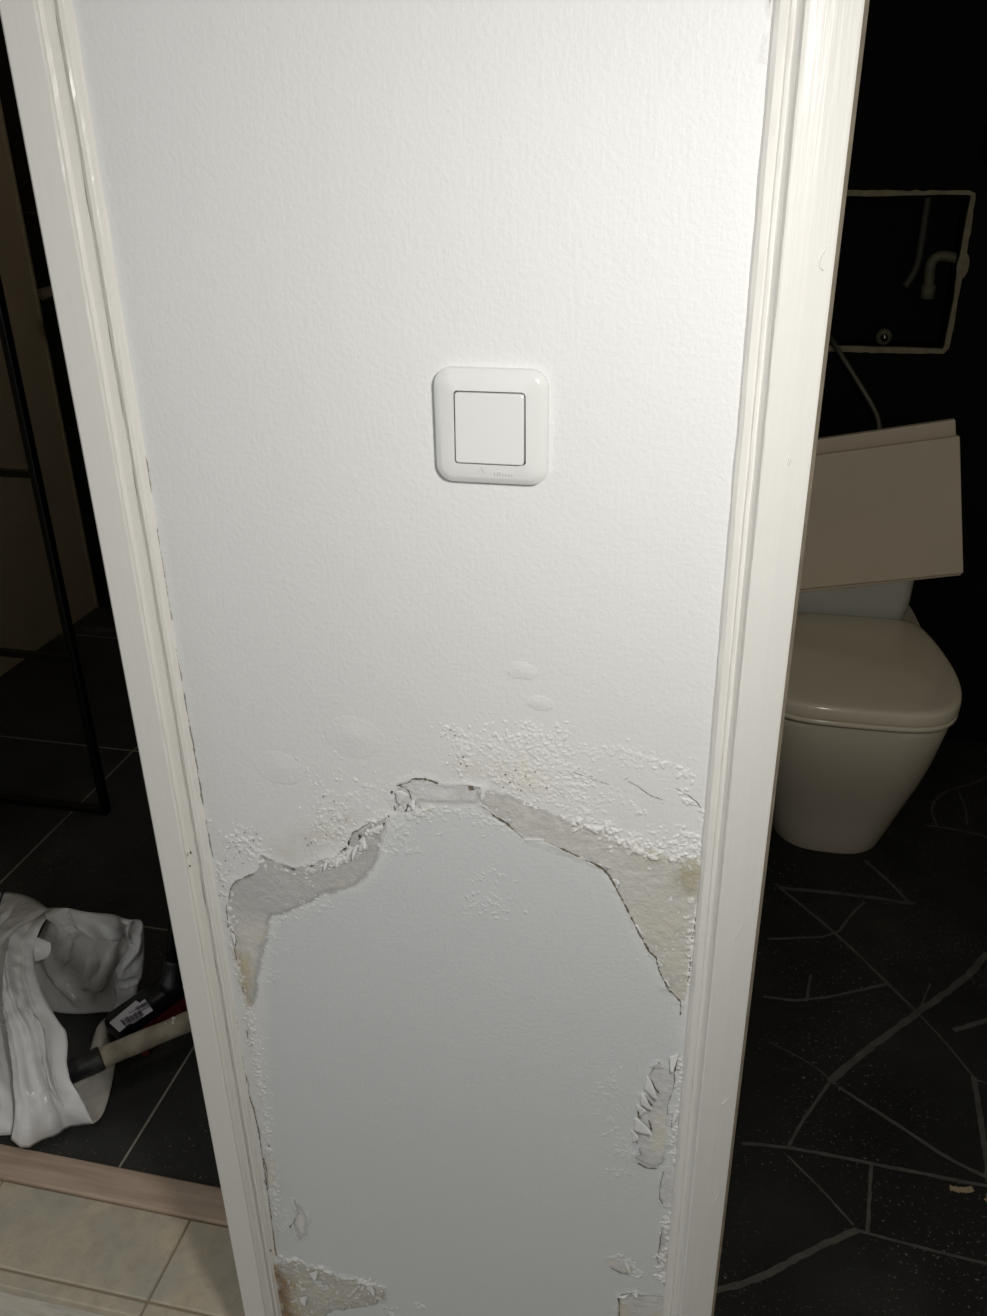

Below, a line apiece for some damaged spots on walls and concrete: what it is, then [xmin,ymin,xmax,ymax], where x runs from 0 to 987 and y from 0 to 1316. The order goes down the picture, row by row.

peeling [219,770,701,1015]
peeling [625,1052,683,1169]
spalling [275,1197,391,1316]
spalling [602,1203,671,1316]